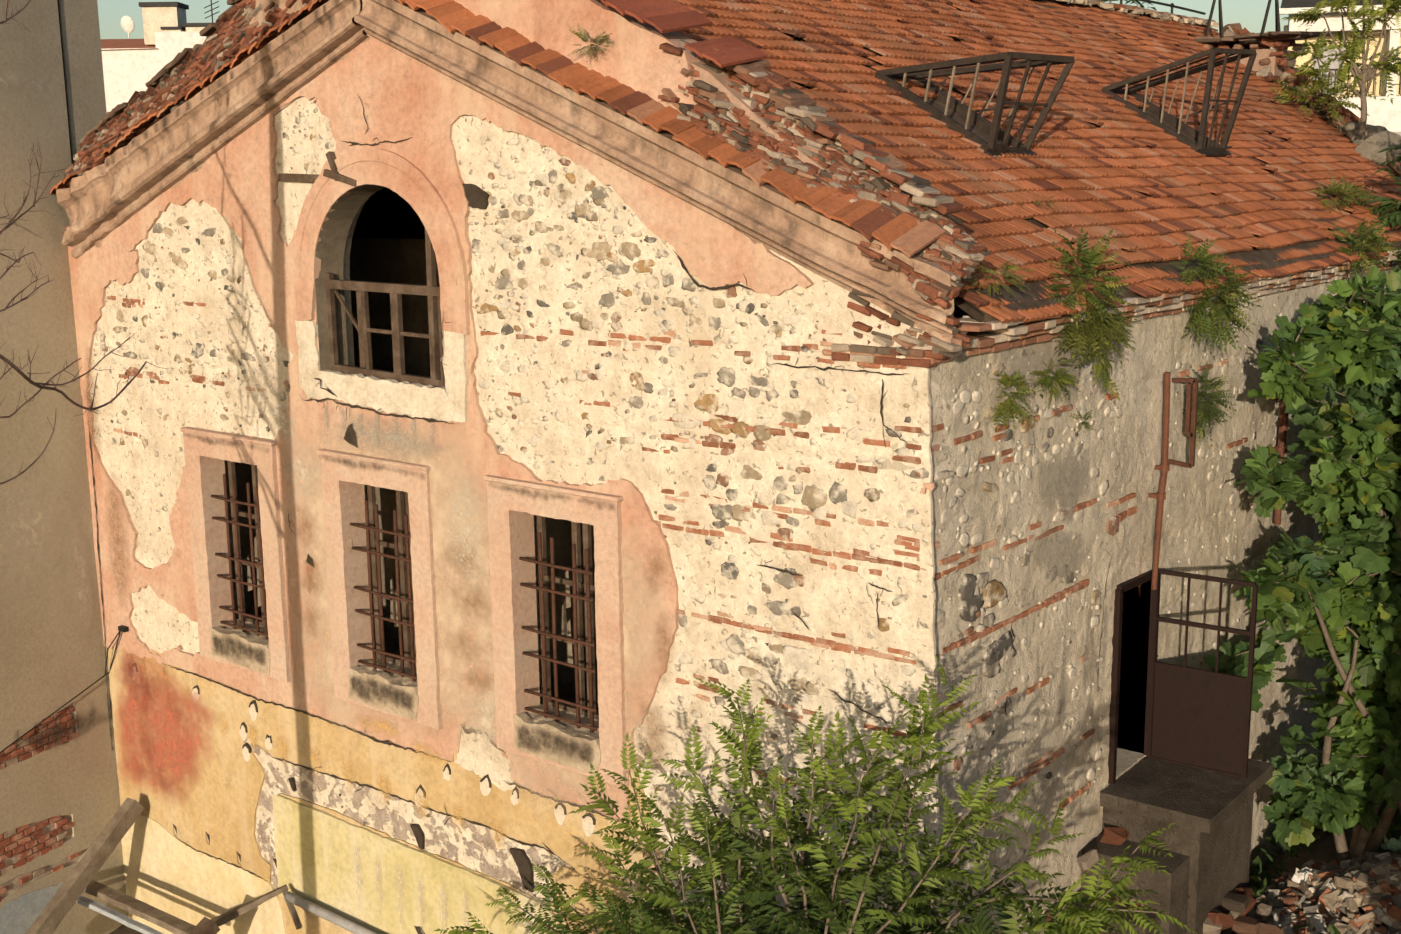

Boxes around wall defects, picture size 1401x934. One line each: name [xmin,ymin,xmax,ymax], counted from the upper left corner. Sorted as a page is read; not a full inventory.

flaking render [270,97,336,245]
flaking render [87,199,293,655]
flaking render [1171,330,1278,407]
flaking render [443,115,1138,934]
flaking render [1160,421,1275,617]
flaking render [0,703,80,770]
flaking render [0,815,88,934]
peeling [121,661,203,782]
flaking render [239,700,570,902]